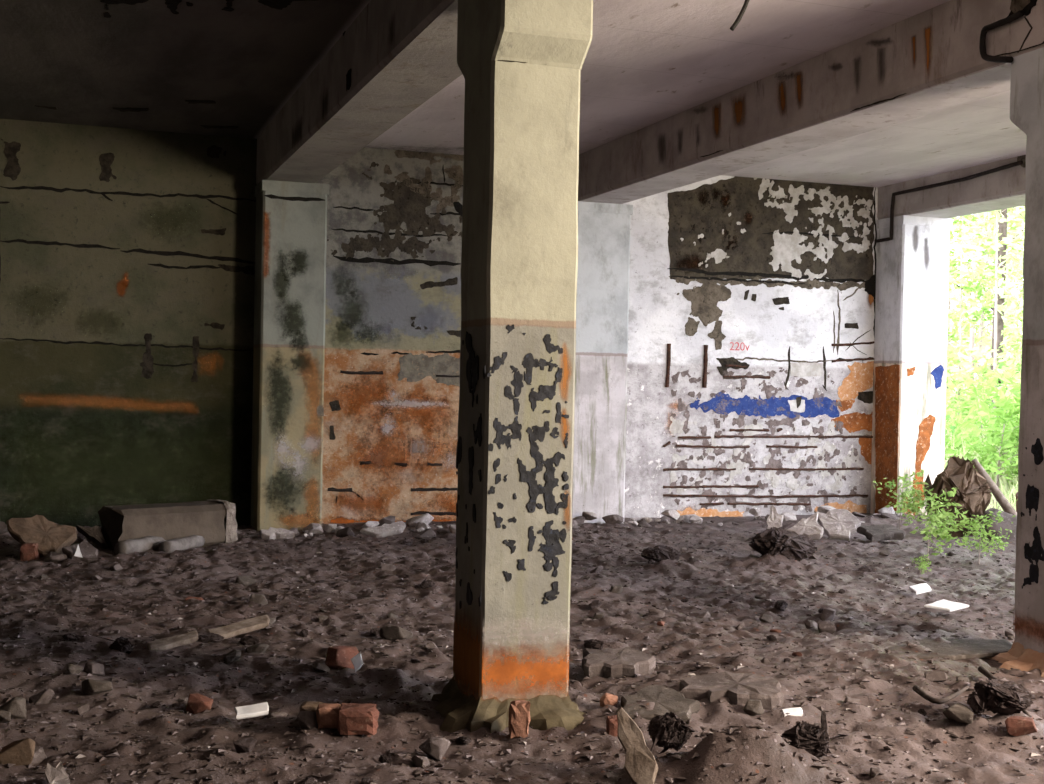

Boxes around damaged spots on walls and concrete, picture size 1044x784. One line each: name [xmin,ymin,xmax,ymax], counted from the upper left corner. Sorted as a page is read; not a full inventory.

crack [996,16,1044,56]
peeling [327,150,464,262]
water stain [266,251,318,514]
peeling [0,322,625,784]
rust [282,479,406,527]
rust [345,376,457,483]
peeling [663,176,936,517]
peeling [931,365,944,389]
peeling [923,474,1044,638]
peeling [1025,438,1044,465]
rust [453,609,569,700]
rust [1013,617,1044,639]